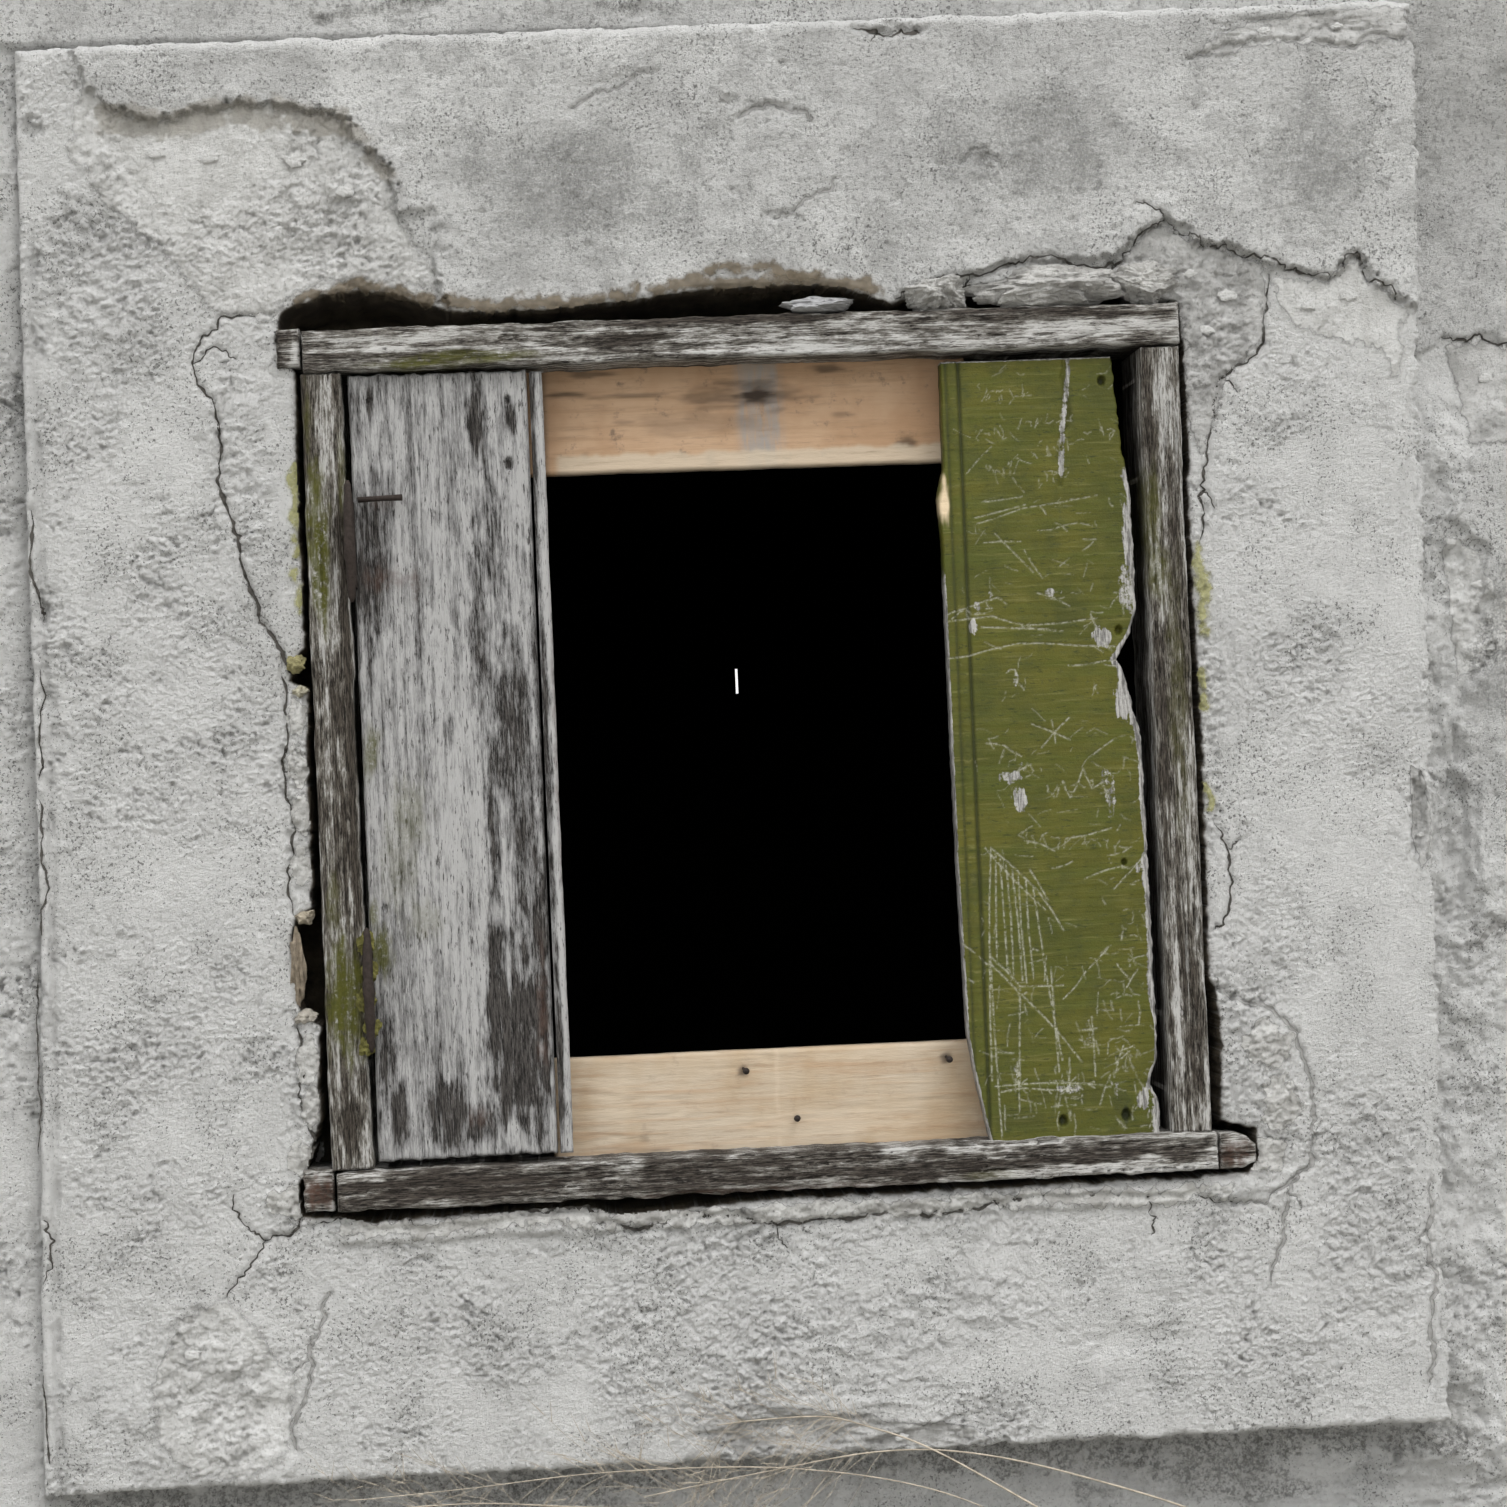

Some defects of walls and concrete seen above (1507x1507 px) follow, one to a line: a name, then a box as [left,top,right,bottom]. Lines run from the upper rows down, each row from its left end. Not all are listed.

crack [896,201,1397,544]
crack [1442,333,1507,347]
crack [191,312,313,913]
crack [1468,921,1507,950]